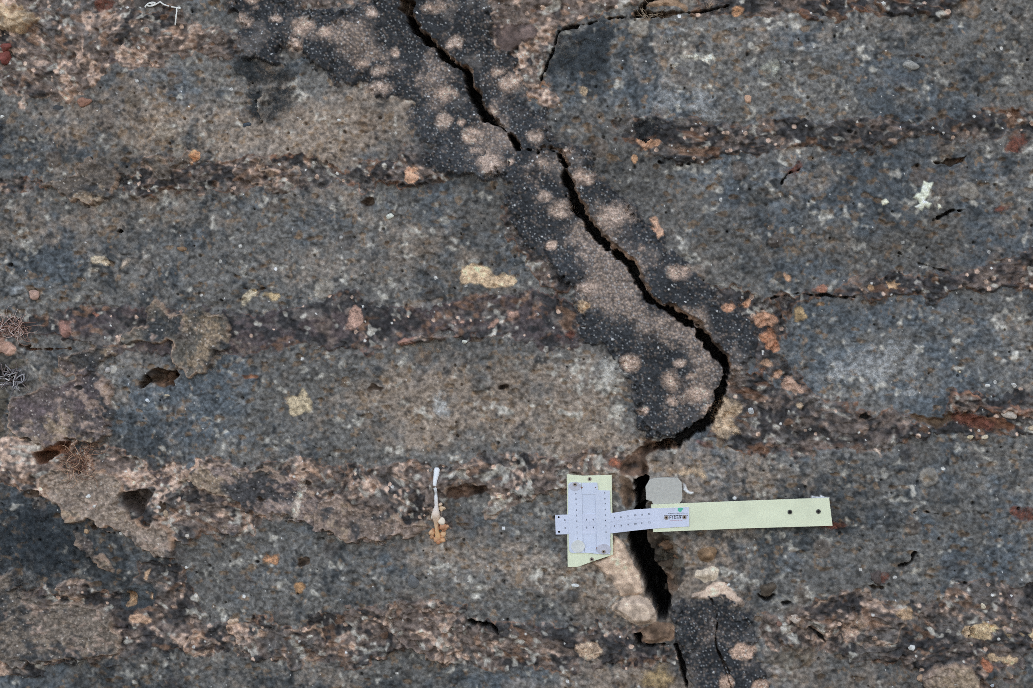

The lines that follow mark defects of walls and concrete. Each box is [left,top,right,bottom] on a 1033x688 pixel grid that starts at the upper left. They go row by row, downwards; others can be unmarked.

crack [397,0,733,452]
peeling [0,299,232,572]
peeling [178,448,626,546]
peeling [0,569,159,677]
crack [465,618,500,636]
crack [618,474,689,688]
crack [710,597,733,688]